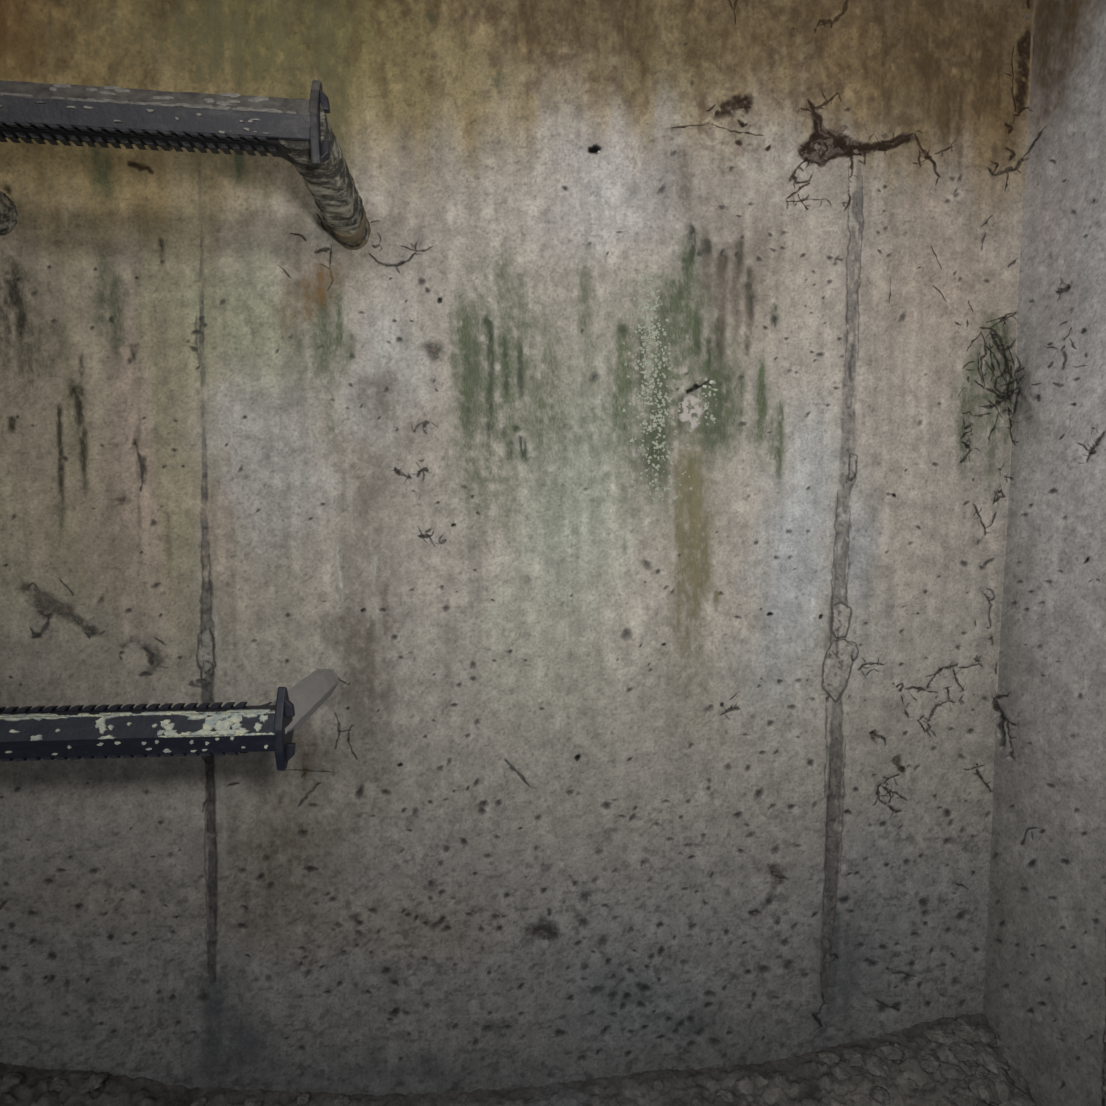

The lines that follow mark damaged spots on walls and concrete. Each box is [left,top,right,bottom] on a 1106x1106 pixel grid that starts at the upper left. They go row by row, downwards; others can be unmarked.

crack [814,0,848,32]
crack [989,37,1043,190]
spalling [128,162,153,173]
leakage [70,386,87,471]
leakage [484,317,527,459]
leakage [619,225,752,600]
crack [821,588,1016,758]
crack [279,713,357,806]
crack [874,774,907,814]
crack [964,764,991,792]
crack [812,953,838,1029]